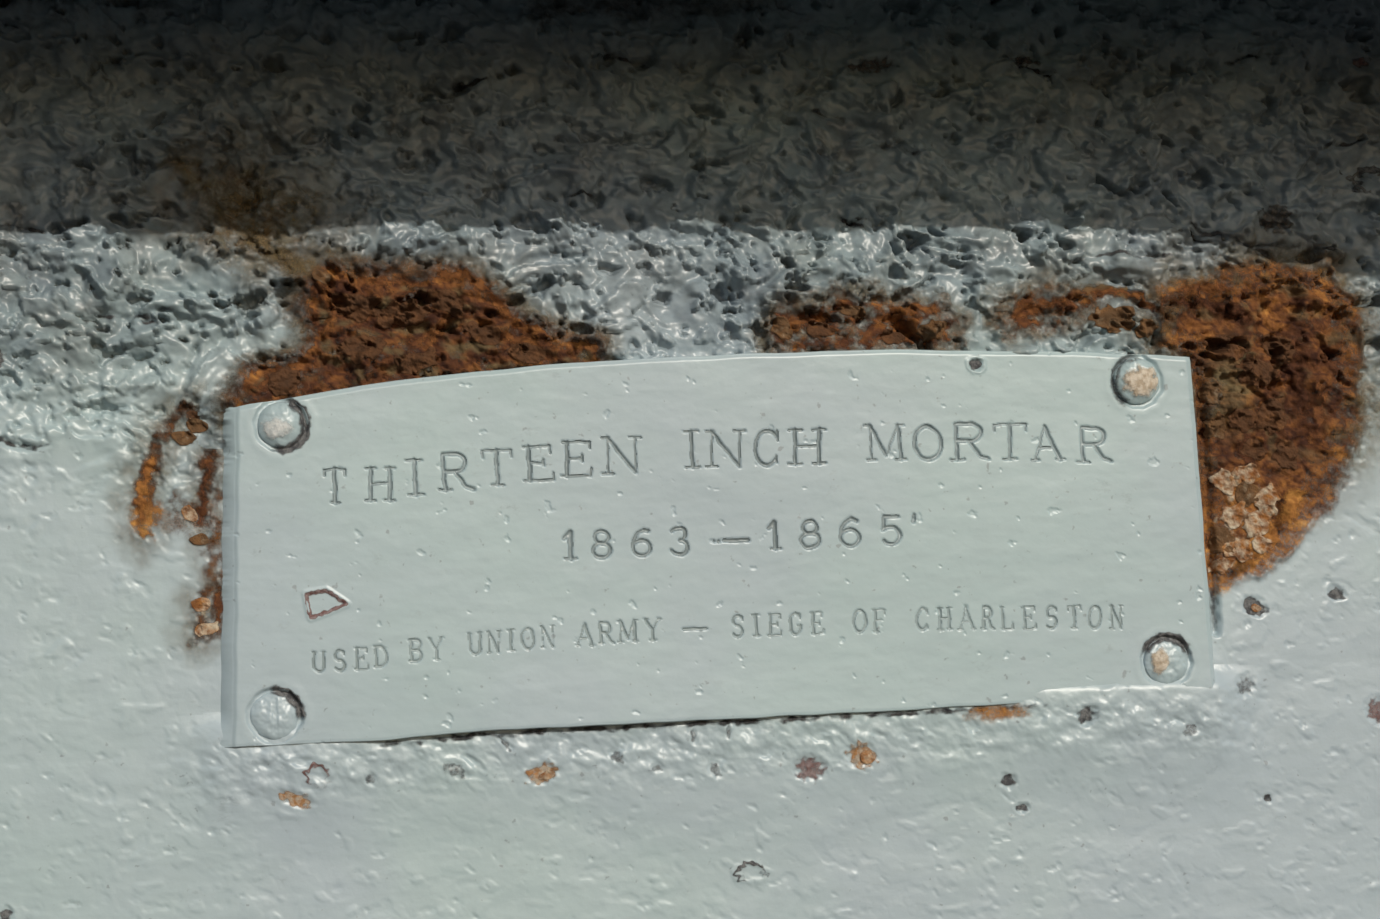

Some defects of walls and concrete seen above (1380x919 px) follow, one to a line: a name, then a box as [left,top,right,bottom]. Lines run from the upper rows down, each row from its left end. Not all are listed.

corrosion [172,157,609,413]
corrosion [759,284,968,353]
corrosion [988,253,1380,592]
corrosion [131,400,223,640]
peeling [1244,597,1268,616]
corrosion [972,706,1025,720]
peeling [1368,700,1380,722]